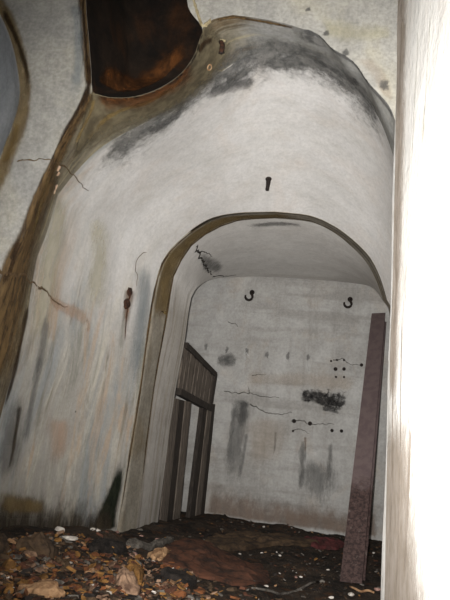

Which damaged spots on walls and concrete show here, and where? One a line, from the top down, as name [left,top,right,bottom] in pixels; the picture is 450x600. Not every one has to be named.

crack [17,158,88,191]
water stain [0,0,405,522]
crack [195,245,234,277]
crack [0,269,67,308]
crack [224,374,332,434]